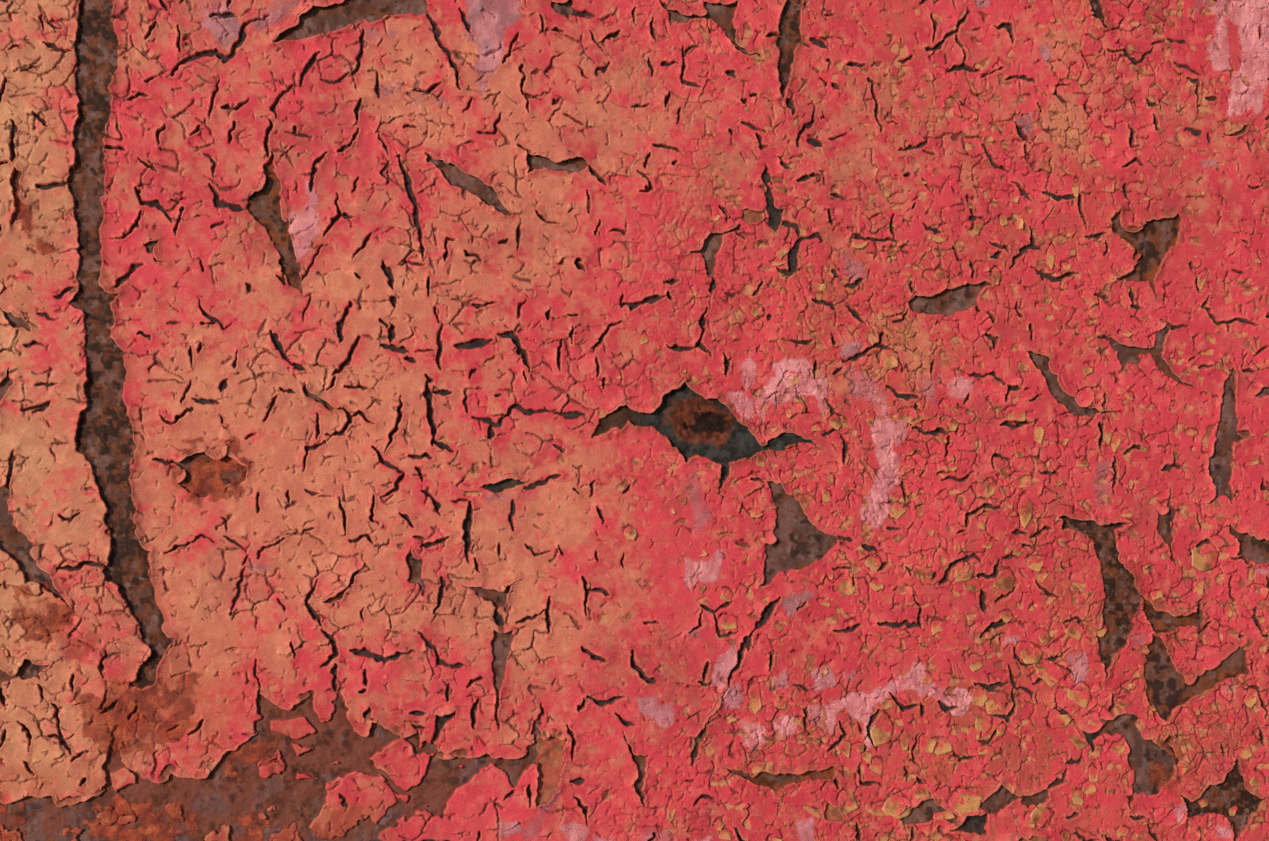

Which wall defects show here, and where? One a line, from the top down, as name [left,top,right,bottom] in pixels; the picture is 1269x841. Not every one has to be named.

crack [0,16,69,166]
peeling [245,154,302,292]
crack [57,561,111,570]
corrosion [172,437,252,501]
peeling [750,451,846,586]
crack [669,0,1269,809]
corrosion [62,794,203,841]
corrosion [77,673,199,757]
corrosion [234,813,288,841]
peeling [0,686,565,841]
crack [532,621,657,818]
peeling [1013,511,1258,806]